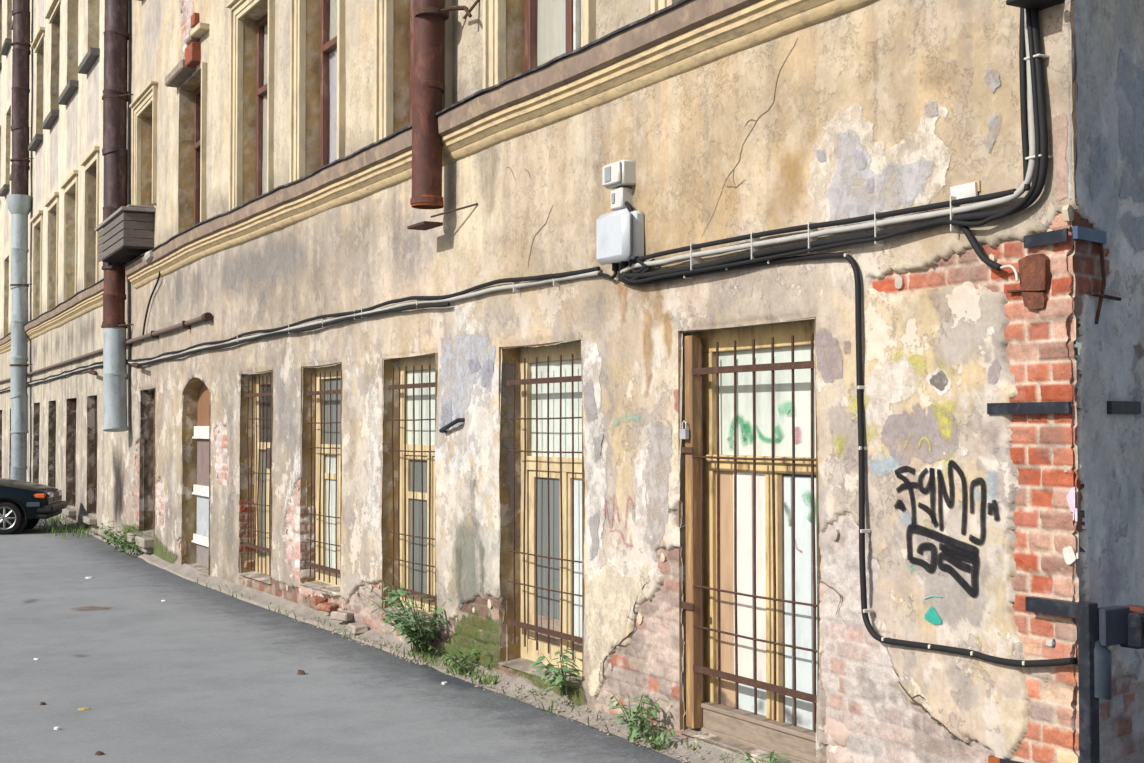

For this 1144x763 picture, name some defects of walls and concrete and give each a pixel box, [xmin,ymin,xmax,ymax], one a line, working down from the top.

rust [411,195,444,209]
crack [702,40,797,236]
peeling [807,101,950,234]
flaking render [214,422,229,486]
flaking render [815,113,1111,763]
flaking render [238,450,402,637]
flaking render [582,340,695,740]
crack [603,582,647,680]
flaking render [1099,656,1144,763]